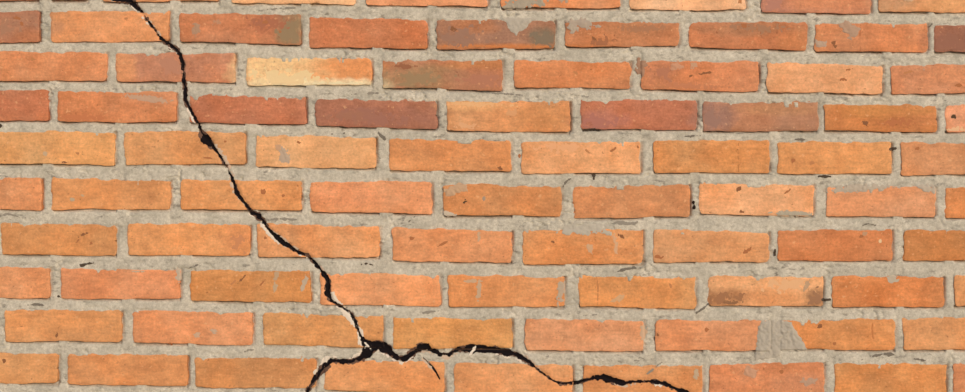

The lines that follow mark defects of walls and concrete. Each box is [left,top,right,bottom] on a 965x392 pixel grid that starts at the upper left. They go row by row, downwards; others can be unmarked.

crack [112,0,689,392]